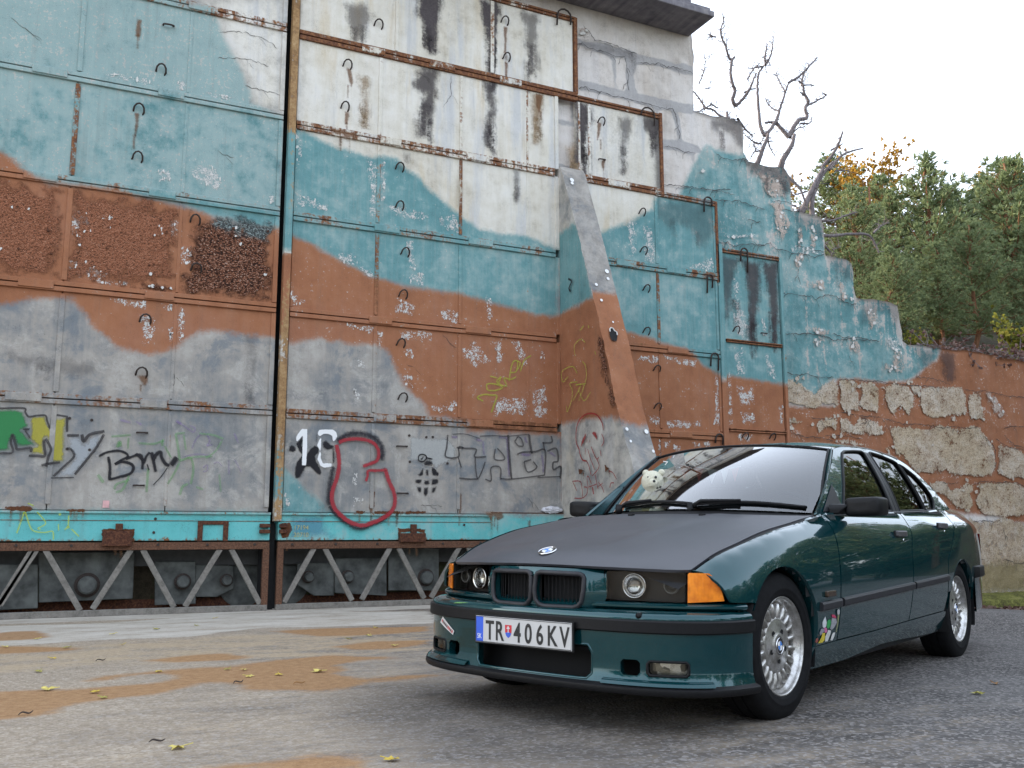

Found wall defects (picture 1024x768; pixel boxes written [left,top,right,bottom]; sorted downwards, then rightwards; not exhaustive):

crack [219,31,276,94]
corrosion [332,113,356,150]
water stain [413,68,437,140]
water stain [416,0,441,53]
water stain [480,0,501,153]
crack [578,25,693,154]
water stain [644,116,659,153]
crack [664,184,855,308]
peeling [759,172,824,269]
water stain [742,261,779,357]
peeling [766,337,1024,587]